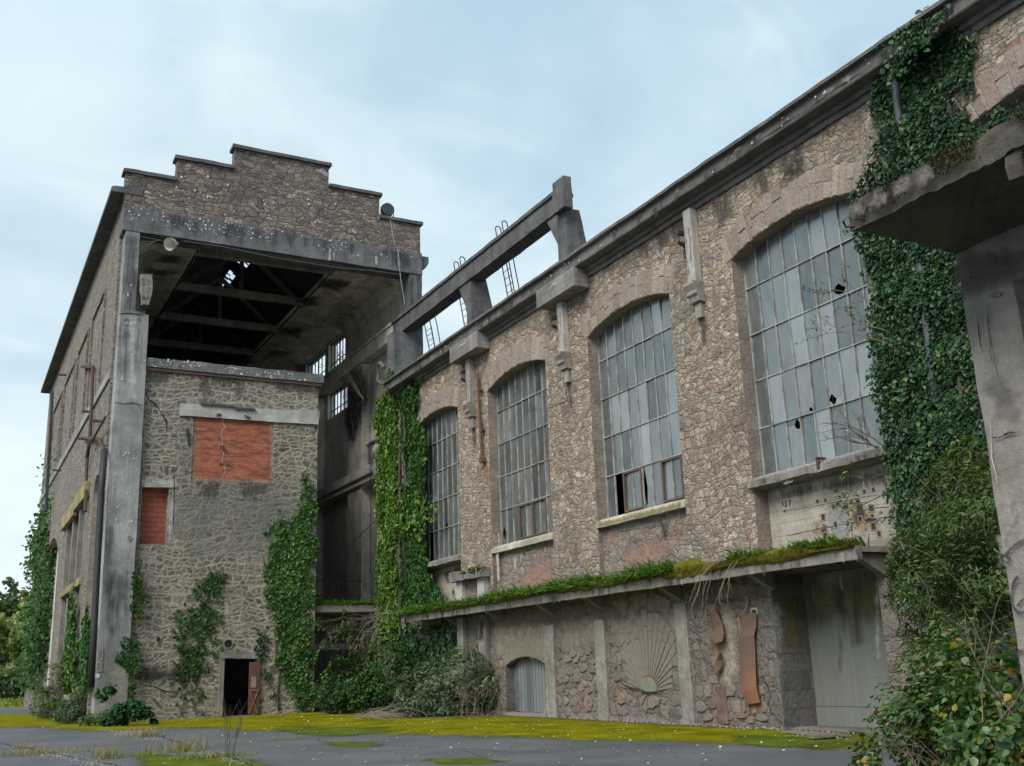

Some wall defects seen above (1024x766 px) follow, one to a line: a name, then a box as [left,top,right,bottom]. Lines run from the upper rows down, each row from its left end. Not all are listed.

crack [116,394,167,428]
crack [217,420,229,478]
rust [739,613,761,714]